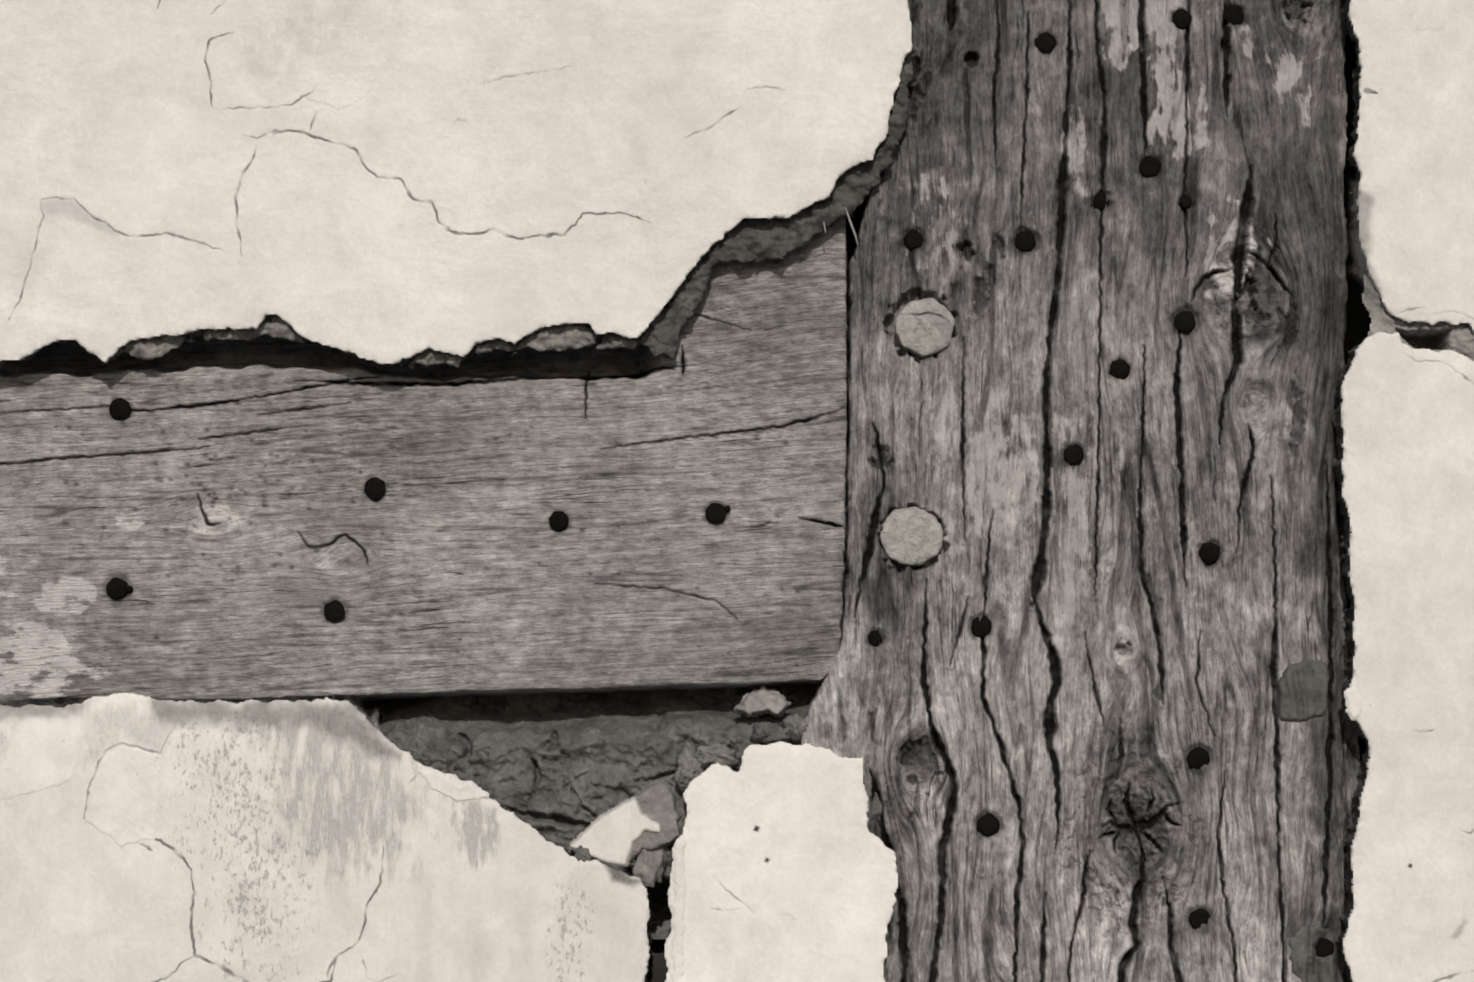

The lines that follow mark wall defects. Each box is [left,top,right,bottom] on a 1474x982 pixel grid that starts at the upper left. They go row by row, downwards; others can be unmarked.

crack [204,38,239,108]
crack [287,96,641,240]
flaking render [99,34,914,369]
spalling [0,340,69,366]
crack [1362,274,1474,361]
flaking render [84,684,818,982]
crack [148,838,231,982]
crack [322,876,382,982]